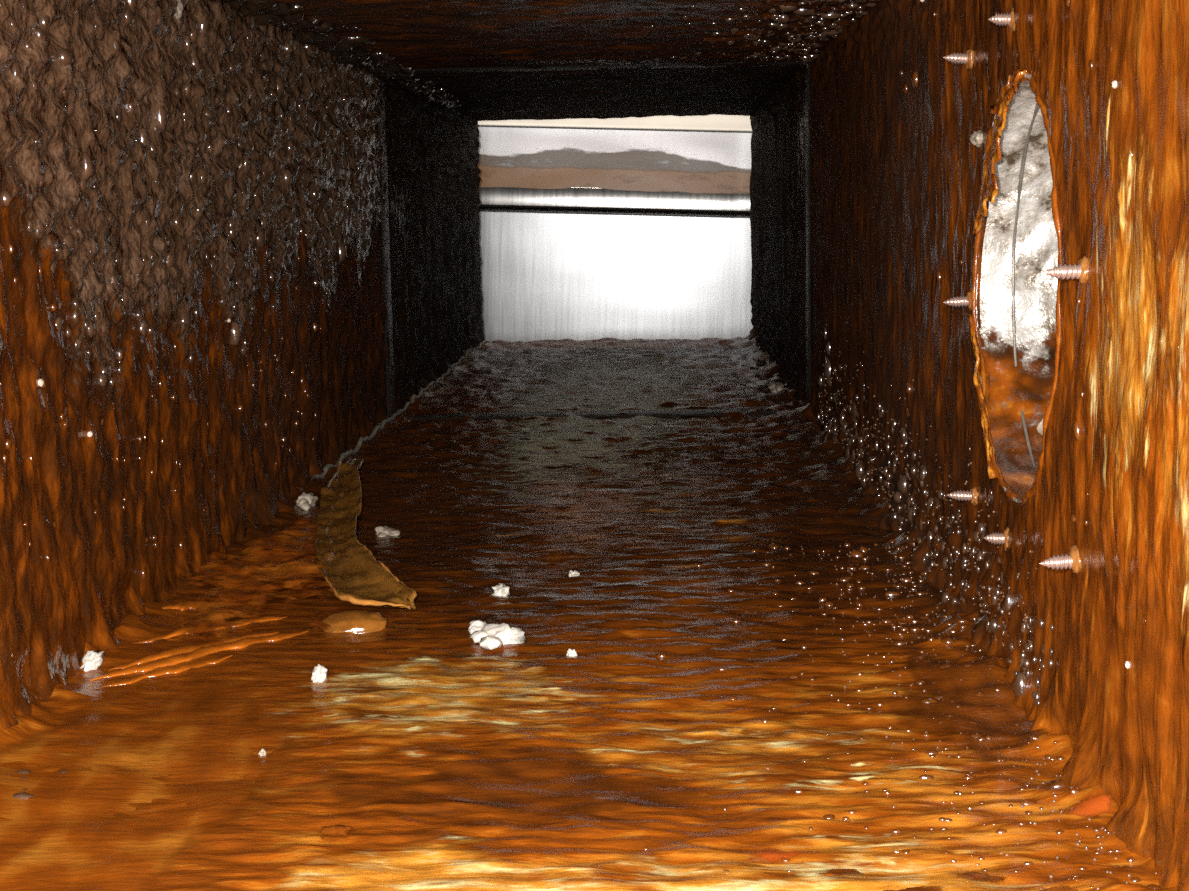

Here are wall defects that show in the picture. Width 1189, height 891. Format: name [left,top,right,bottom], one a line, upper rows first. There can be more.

peeling [969,70,1028,236]
water stain [1096,147,1137,302]
corrosion [1096,0,1189,261]
peeling [969,314,997,479]
water stain [1091,342,1118,433]
water stain [1092,431,1148,483]
water stain [1142,293,1157,379]
corrosion [892,654,1046,758]
corrosion [1061,566,1189,842]
corrosion [0,680,317,891]
corrosion [750,849,803,864]